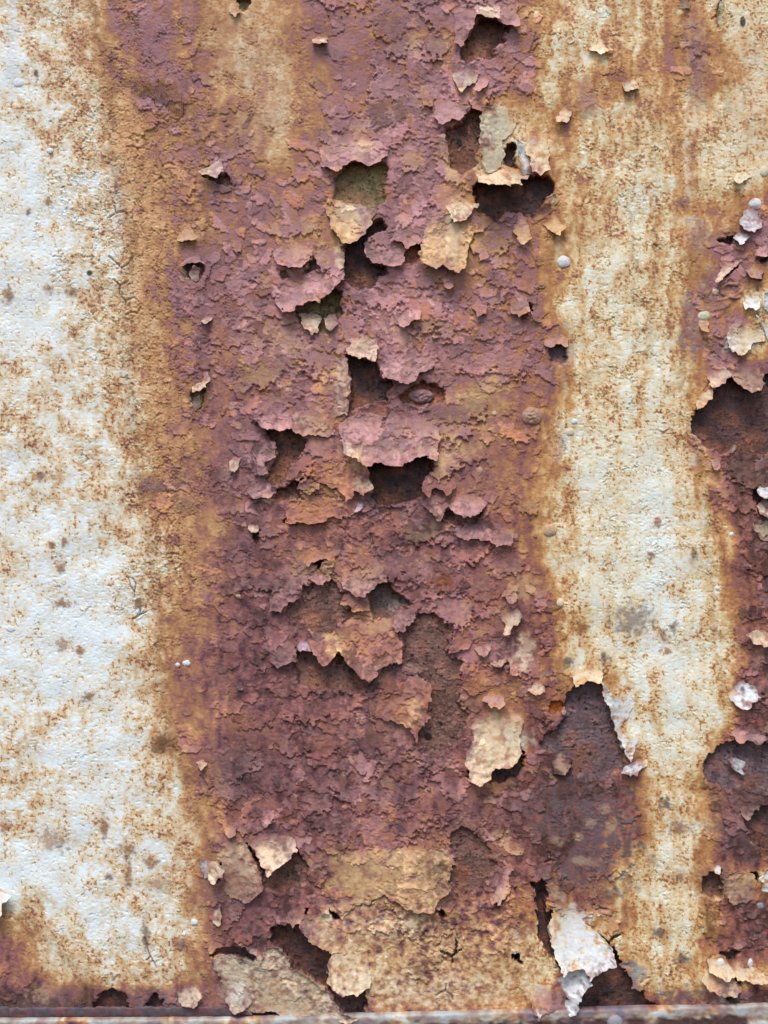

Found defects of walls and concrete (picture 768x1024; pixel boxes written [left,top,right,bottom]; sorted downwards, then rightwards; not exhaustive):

corrosion [273,90,566,335]
corrosion [718,230,750,246]
peeling [739,204,762,233]
corrosion [544,334,568,364]
peeling [726,292,768,356]
corrosion [677,259,768,689]
corrosion [0,0,525,1024]
peeling [499,584,523,636]
peeling [746,630,768,647]
peeling [728,680,761,710]
corrosion [530,652,768,1022]
peeling [178,986,202,1009]